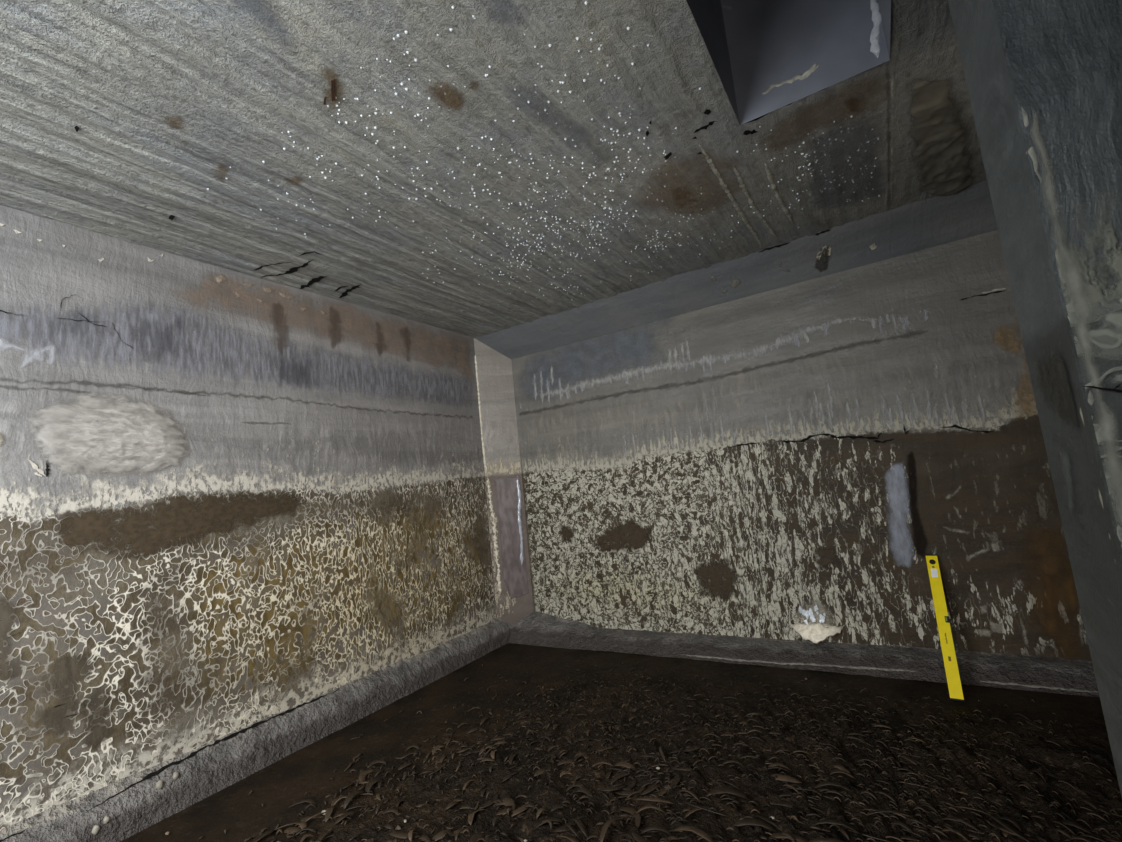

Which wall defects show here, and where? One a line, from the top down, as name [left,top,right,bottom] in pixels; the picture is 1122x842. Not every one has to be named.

rust [324,71,340,105]
water stain [812,128,877,207]
crack [255,251,361,298]
water stain [1021,107,1122,547]
crack [724,427,909,449]
crack [940,424,996,433]
water stain [0,308,1046,831]